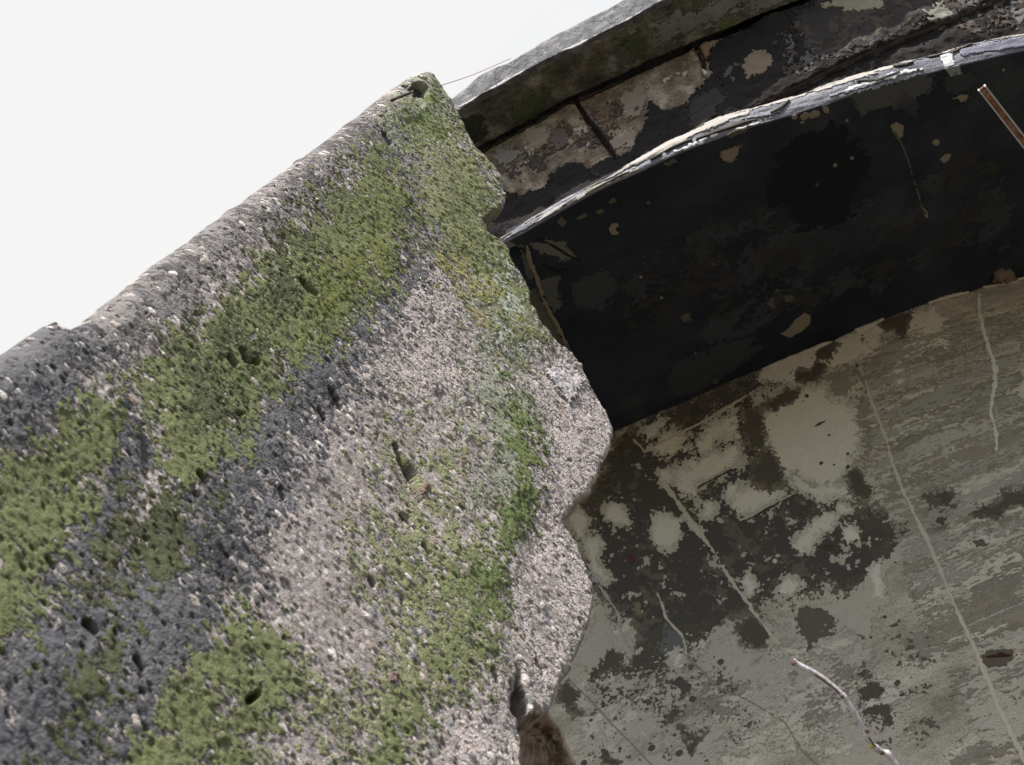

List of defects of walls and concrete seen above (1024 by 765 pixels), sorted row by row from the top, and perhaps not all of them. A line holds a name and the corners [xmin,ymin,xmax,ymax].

spalling [459,62,540,108]
peeling [492,57,926,239]
peeling [741,49,774,80]
peeling [940,34,1024,68]
rust [978,84,1024,149]
spalling [343,257,489,440]
crack [976,293,999,453]
spalling [422,245,833,765]
leakage [553,302,1024,765]
peeling [771,452,910,652]
crack [857,361,1024,765]
peeling [850,615,940,749]